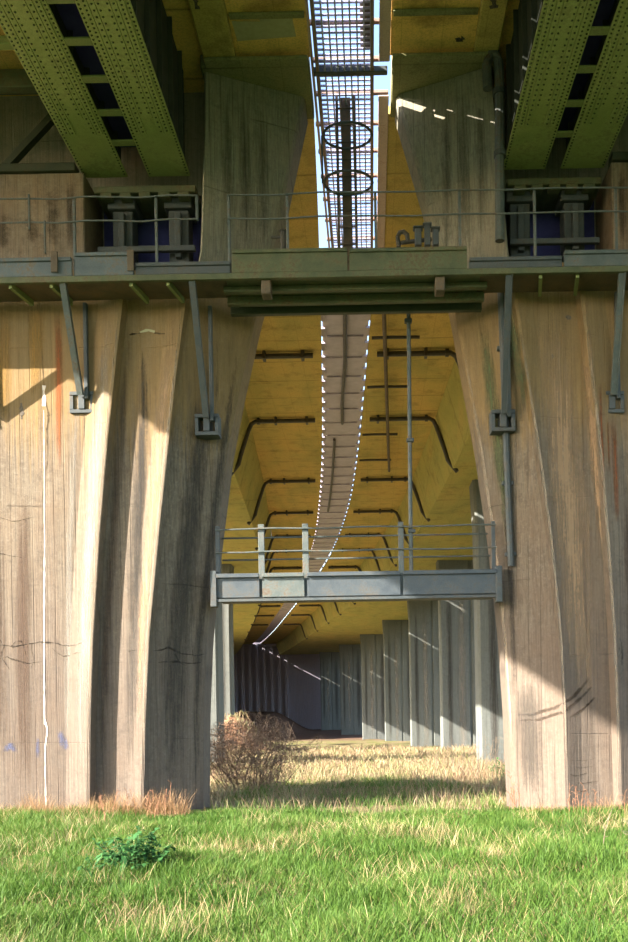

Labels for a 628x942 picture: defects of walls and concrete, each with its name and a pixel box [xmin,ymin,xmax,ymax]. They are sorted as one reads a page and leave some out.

rust [0,332,9,402]
crack [0,355,79,803]
leakage [129,353,177,736]
leakage [166,437,224,730]
leakage [488,321,618,779]